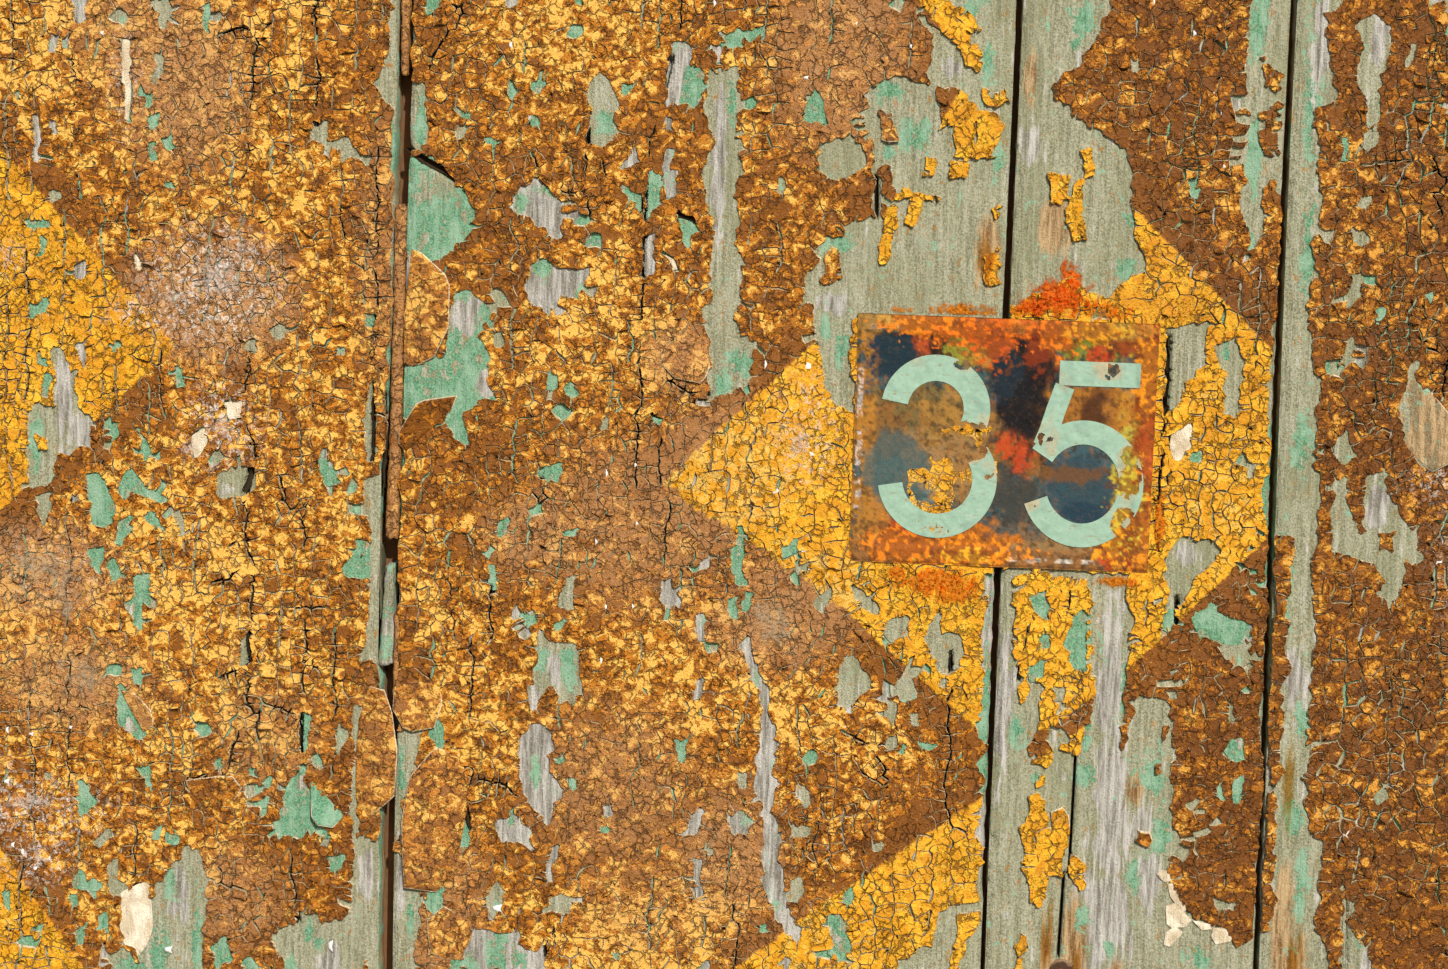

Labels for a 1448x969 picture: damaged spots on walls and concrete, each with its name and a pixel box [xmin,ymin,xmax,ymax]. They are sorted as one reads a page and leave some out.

crack [3,258,32,442]
peeling [24,341,189,630]
crack [226,24,268,176]
crack [185,358,338,790]
peeling [373,0,496,451]
crack [448,580,494,715]
peeling [495,575,582,915]
peeling [660,27,764,402]
crack [943,654,960,829]
peeling [801,0,1146,412]
corrosion [1012,263,1129,318]
peeling [884,0,1448,969]